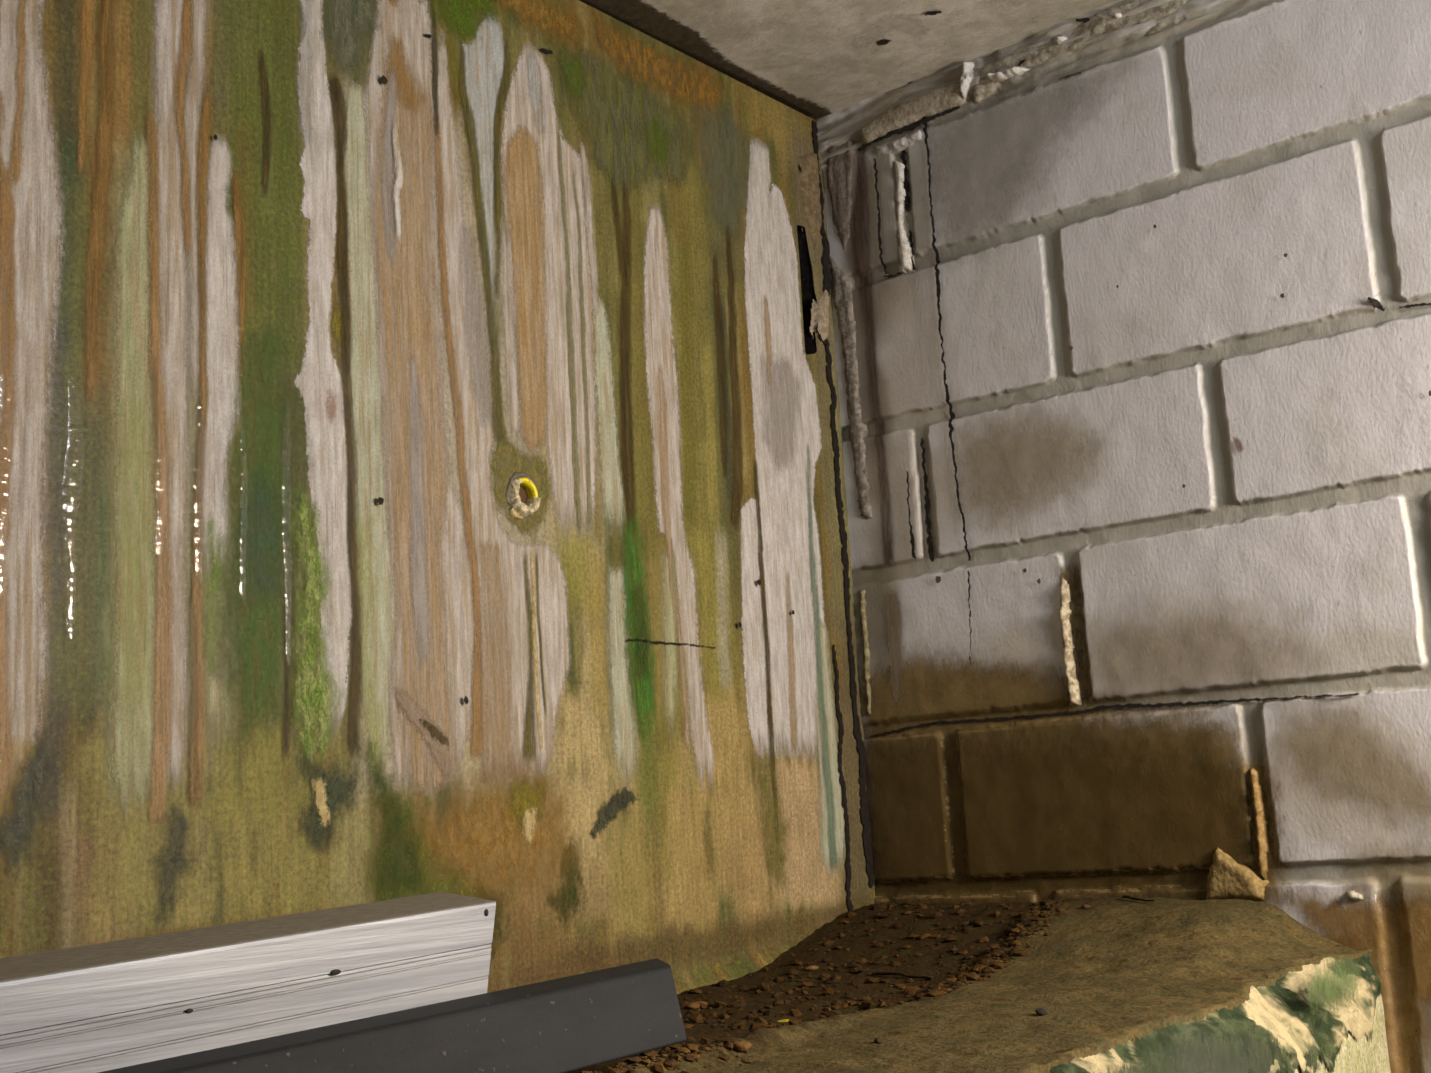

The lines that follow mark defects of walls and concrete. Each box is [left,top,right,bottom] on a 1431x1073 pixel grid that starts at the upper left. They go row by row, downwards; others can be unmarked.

leakage [0,0,64,800]
leakage [109,0,239,821]
leakage [294,0,624,794]
leakage [607,570,637,774]
leakage [642,207,713,782]
leakage [579,0,833,120]
leakage [740,141,846,870]
peeling [874,128,924,275]
leakage [860,655,1288,904]
peeling [960,0,1192,104]
crack [799,106,1359,911]
leakage [1354,851,1431,900]